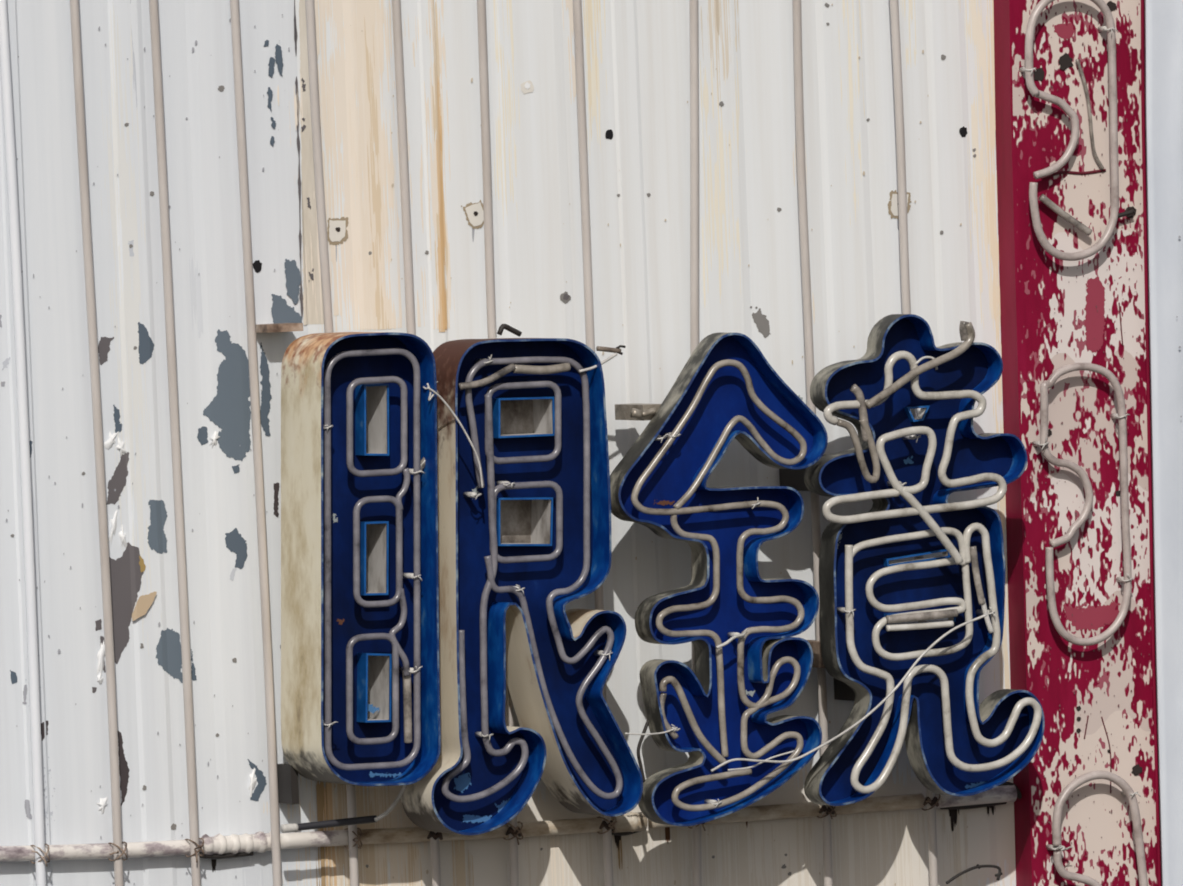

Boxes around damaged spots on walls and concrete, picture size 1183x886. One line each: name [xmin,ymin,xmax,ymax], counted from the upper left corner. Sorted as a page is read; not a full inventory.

peeling [264,40,283,146]
rust [424,0,455,332]
rust [461,200,484,229]
peeling [98,337,114,365]
peeling [138,322,154,364]
peeling [197,329,272,474]
peeling [1012,0,1158,886]
peeling [147,500,168,554]
peeling [225,528,248,581]
peeling [132,592,157,621]
peeling [140,628,197,683]